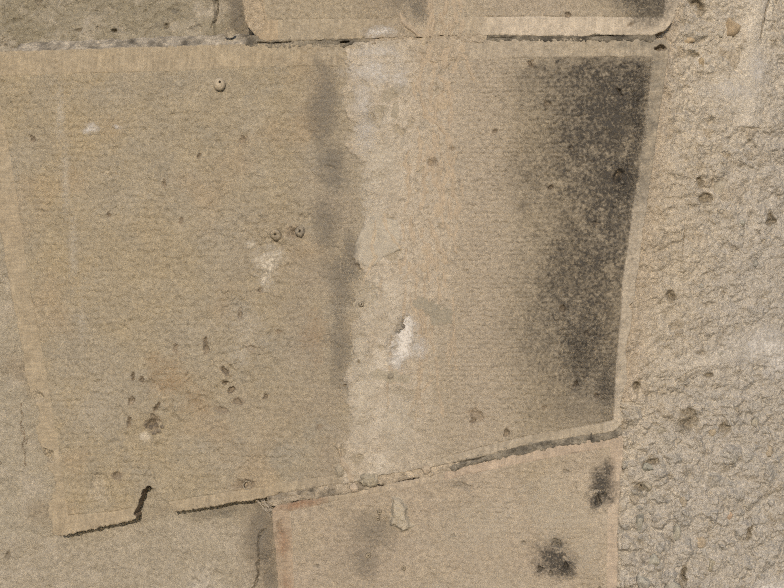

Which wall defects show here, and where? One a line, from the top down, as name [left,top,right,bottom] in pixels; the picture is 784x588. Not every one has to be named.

water stain [356,0,476,288]
water stain [389,316,424,368]
crack [252,532,261,588]